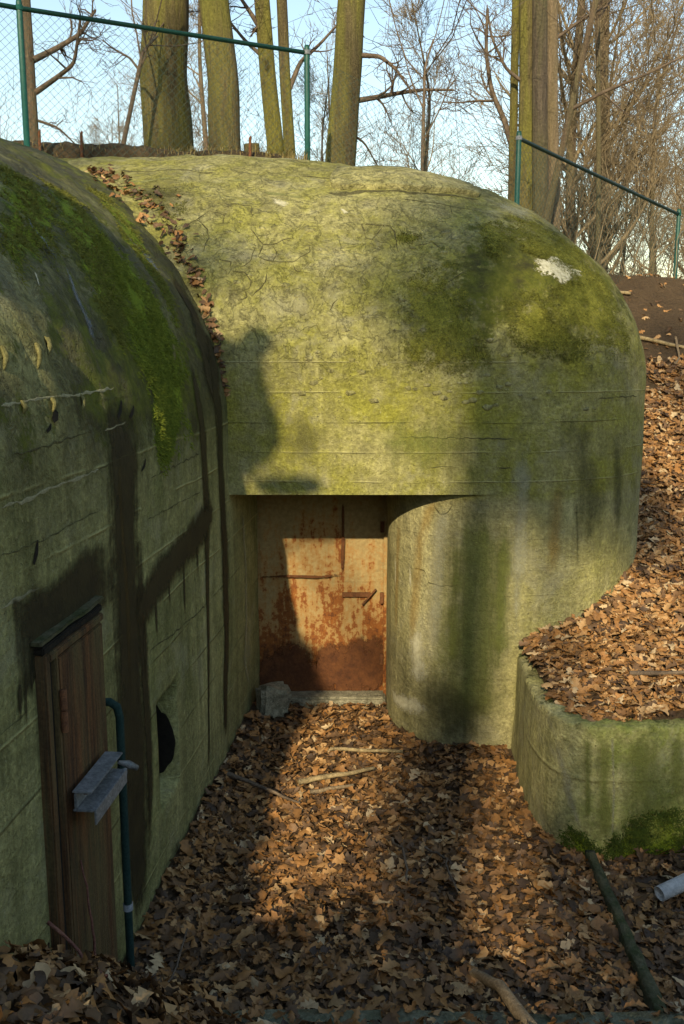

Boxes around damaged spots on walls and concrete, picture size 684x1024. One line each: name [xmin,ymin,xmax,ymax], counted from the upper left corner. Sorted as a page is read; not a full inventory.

rust [263,506,345,578]
rust [259,635,383,691]